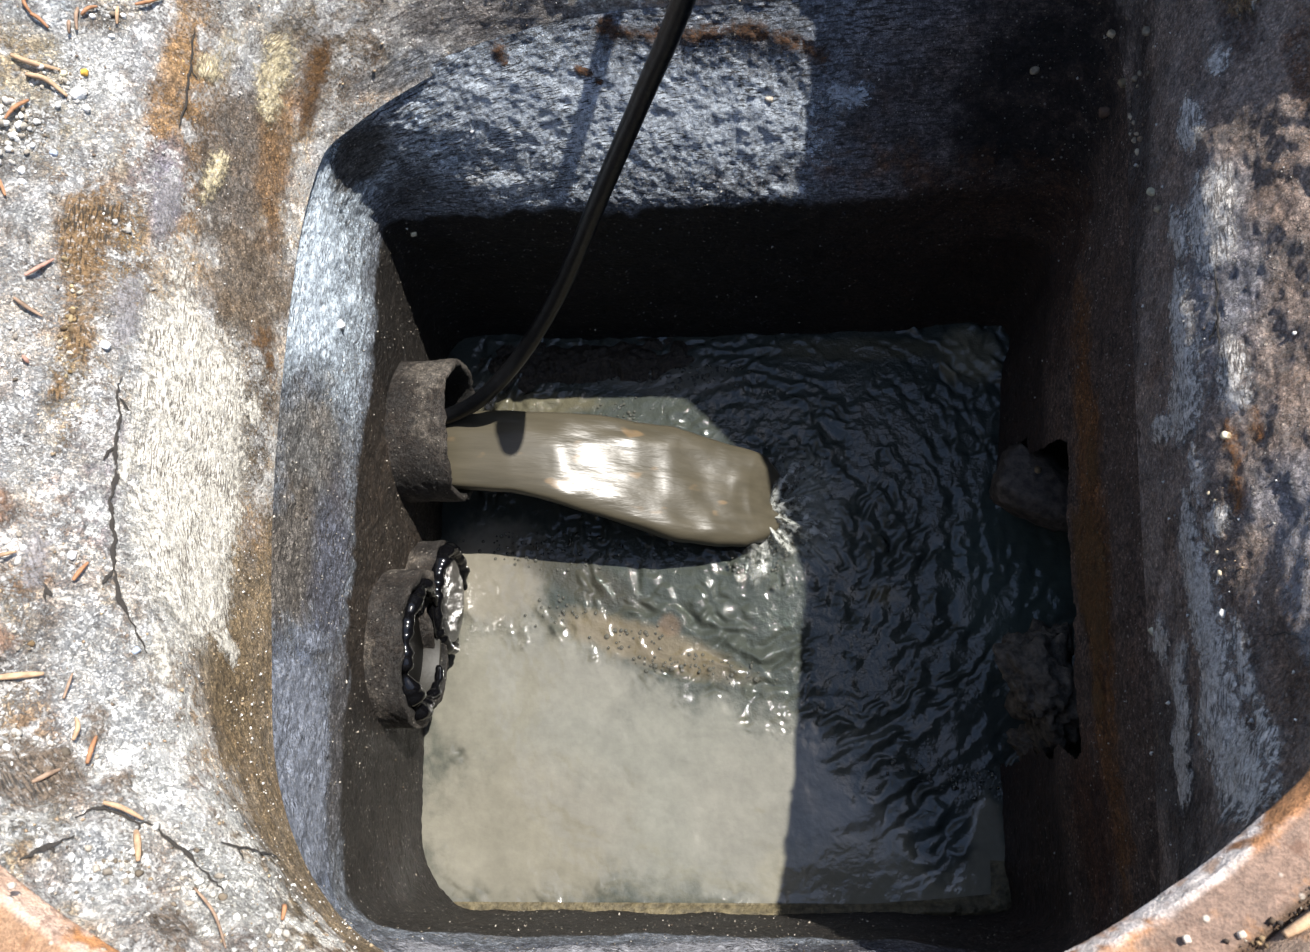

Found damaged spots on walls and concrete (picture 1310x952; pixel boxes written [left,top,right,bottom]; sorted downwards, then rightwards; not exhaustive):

rust [491,42,509,67]
rust [573,65,604,85]
rust [597,18,660,42]
rust [679,22,826,63]
crack [102,376,148,654]
crack [19,806,280,890]